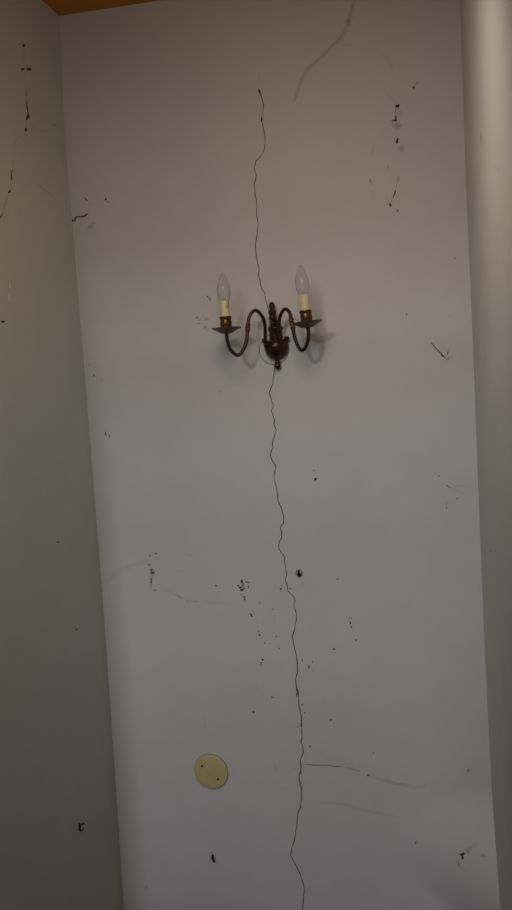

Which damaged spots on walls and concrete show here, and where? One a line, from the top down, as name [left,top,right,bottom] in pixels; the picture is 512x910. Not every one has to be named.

crack [254,89,270,316]
crack [250,365,342,910]